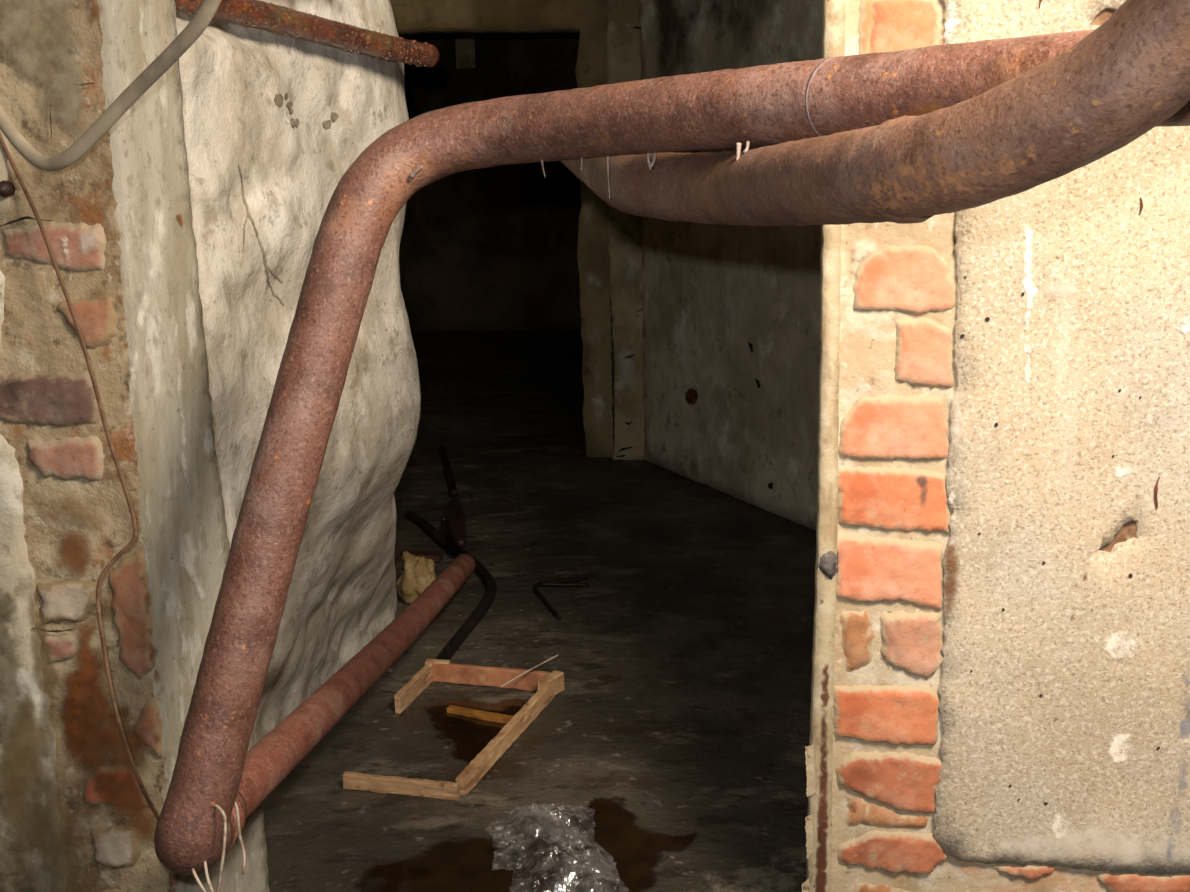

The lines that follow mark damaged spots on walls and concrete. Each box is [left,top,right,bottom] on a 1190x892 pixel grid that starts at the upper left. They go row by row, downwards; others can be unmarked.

spalling [844,0,946,56]
spalling [0,0,174,892]
spalling [831,212,1190,892]
damp [0,591,54,892]
peeling [805,814,814,859]
peeling [805,744,816,797]
corrosion [816,666,829,892]